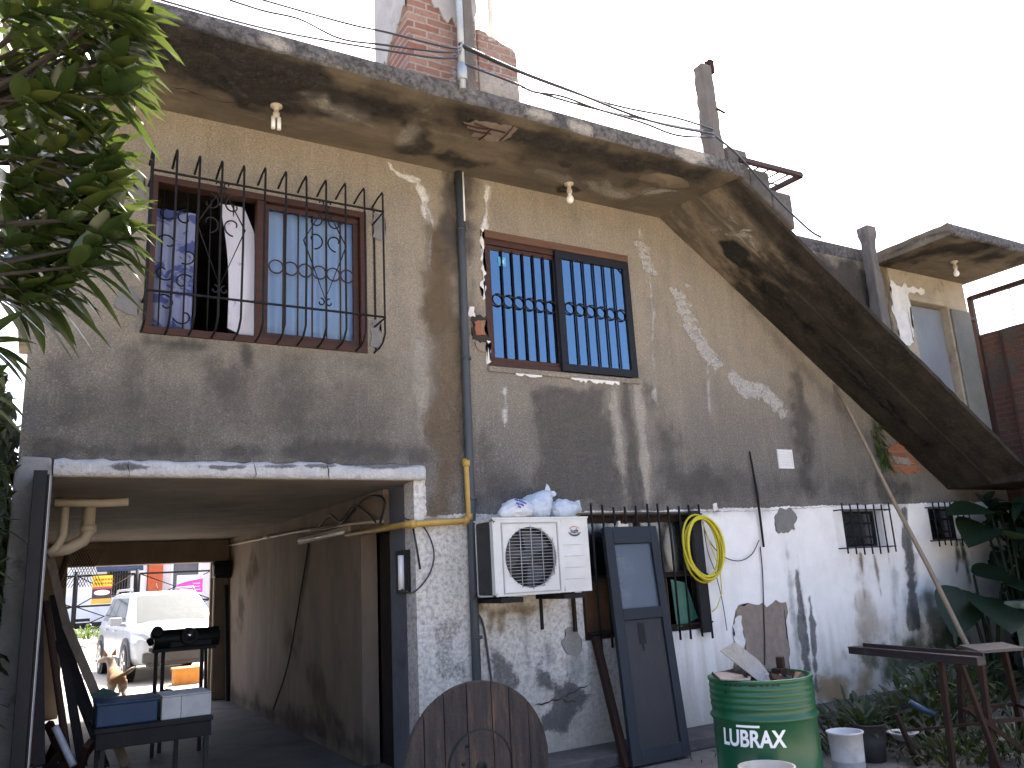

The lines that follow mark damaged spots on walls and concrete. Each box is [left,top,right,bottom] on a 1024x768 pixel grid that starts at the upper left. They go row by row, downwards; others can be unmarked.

water stain [507,129,709,179]
water stain [144,17,490,517]
spalling [468,228,491,364]
peeling [670,284,787,418]
water stain [719,230,755,267]
peeling [890,280,925,346]
water stain [534,381,656,512]
spalling [885,441,924,475]
water stain [877,478,960,644]
peeling [732,615,746,650]
water stain [795,570,818,692]
crack [536,685,588,705]